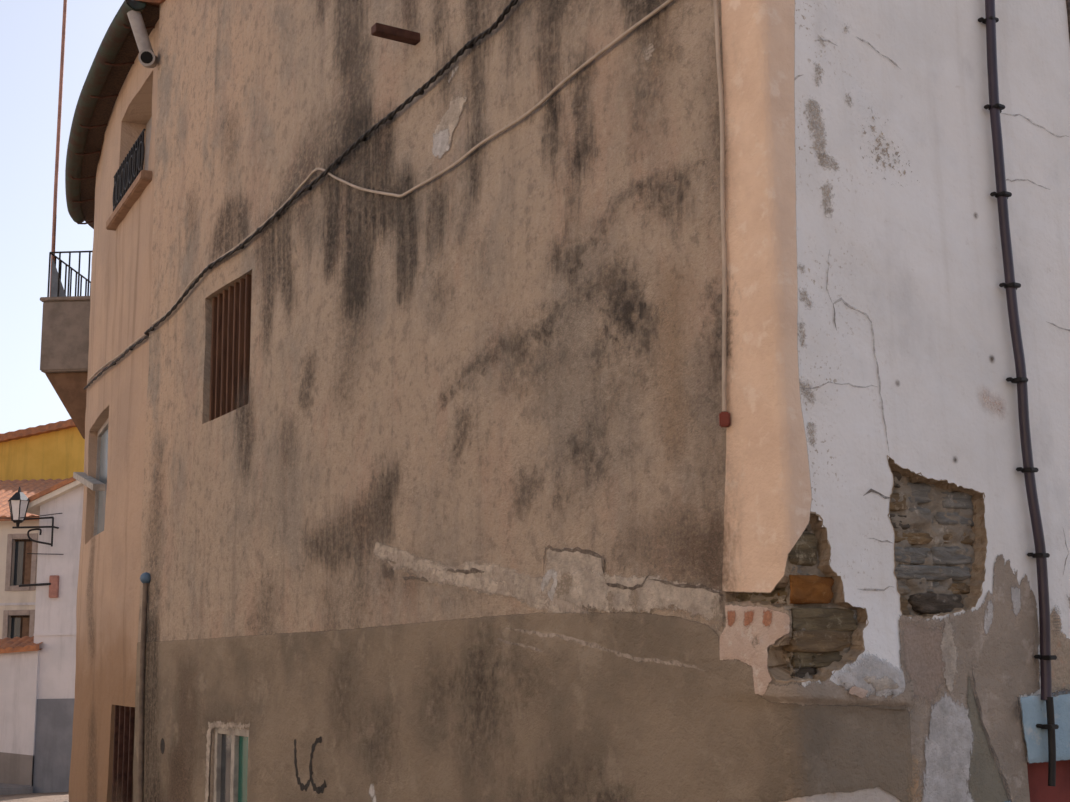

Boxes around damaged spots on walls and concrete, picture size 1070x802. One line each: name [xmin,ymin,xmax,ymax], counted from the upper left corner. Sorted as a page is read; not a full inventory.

leakage [262,206,292,337]
leakage [323,104,443,316]
peeling [432,95,467,159]
crack [804,252,888,444]
leakage [316,472,577,613]
peeling [539,455,1070,802]